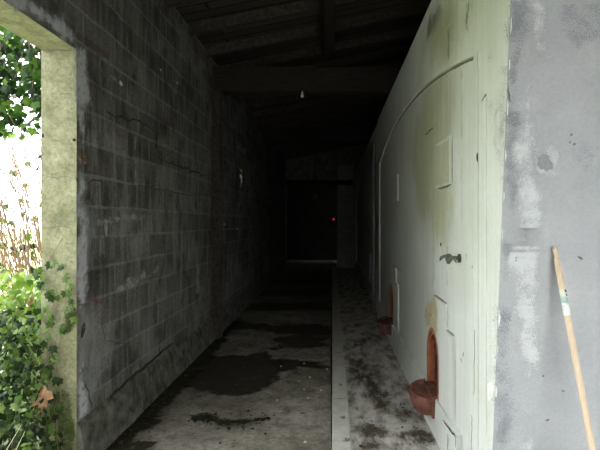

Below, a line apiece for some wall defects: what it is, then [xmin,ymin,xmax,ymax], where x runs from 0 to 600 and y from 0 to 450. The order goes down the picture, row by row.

crack [109,343,173,402]
water stain [172,317,332,397]